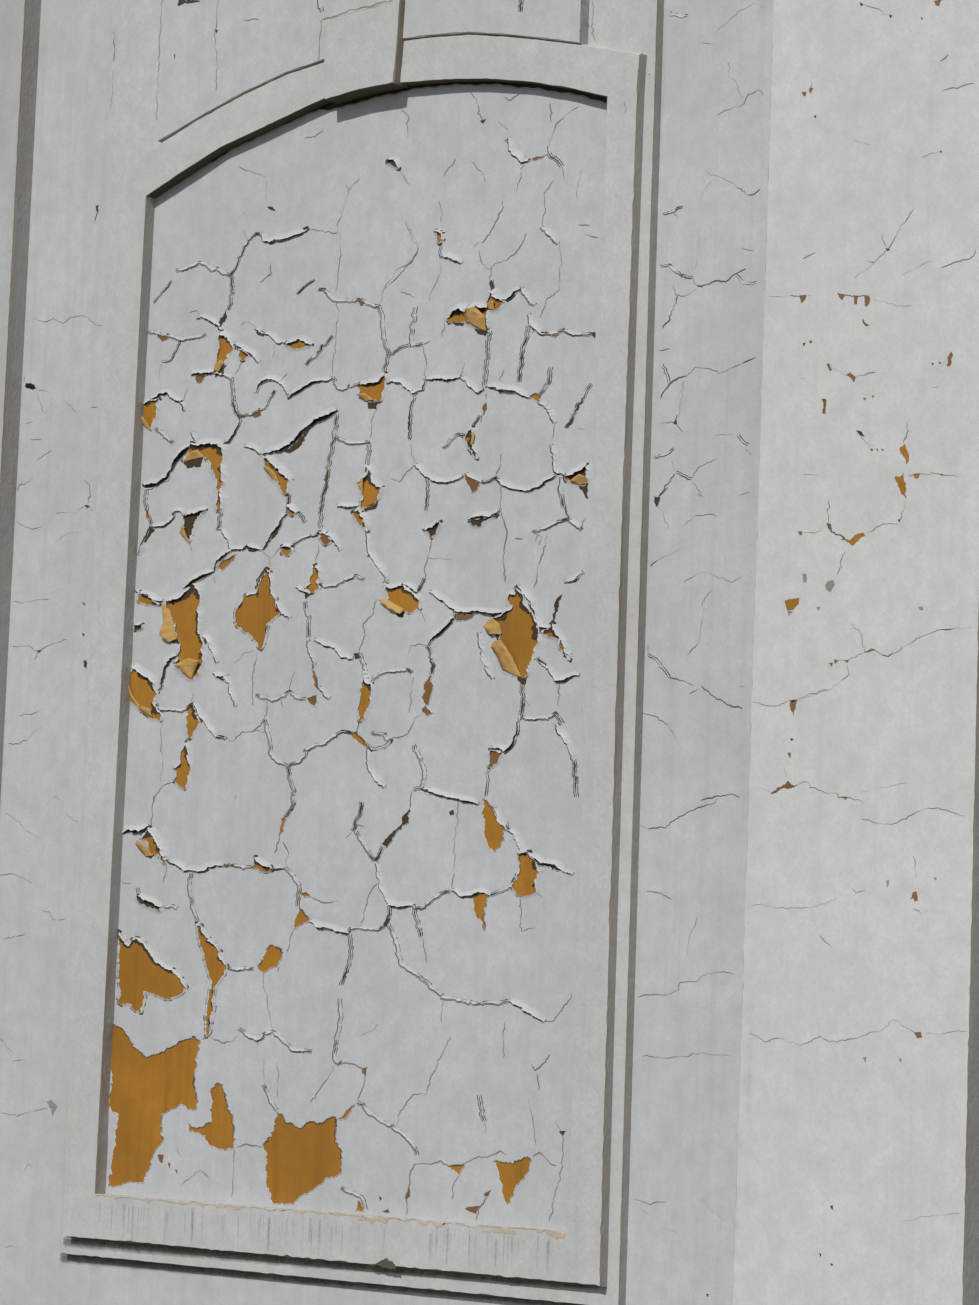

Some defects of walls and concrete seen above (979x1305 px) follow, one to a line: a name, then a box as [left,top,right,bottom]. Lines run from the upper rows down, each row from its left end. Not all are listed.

peeling [128,548,236,791]
peeling [142,275,315,551]
crack [216,512,287,552]
crack [212,670,353,855]
peeling [233,455,365,707]
crack [154,178,557,529]
peeling [350,508,575,931]
peeling [442,280,521,493]
crack [477,632,582,797]
crack [654,169,759,527]
peeling [96,817,566,1238]
crack [209,744,571,1214]